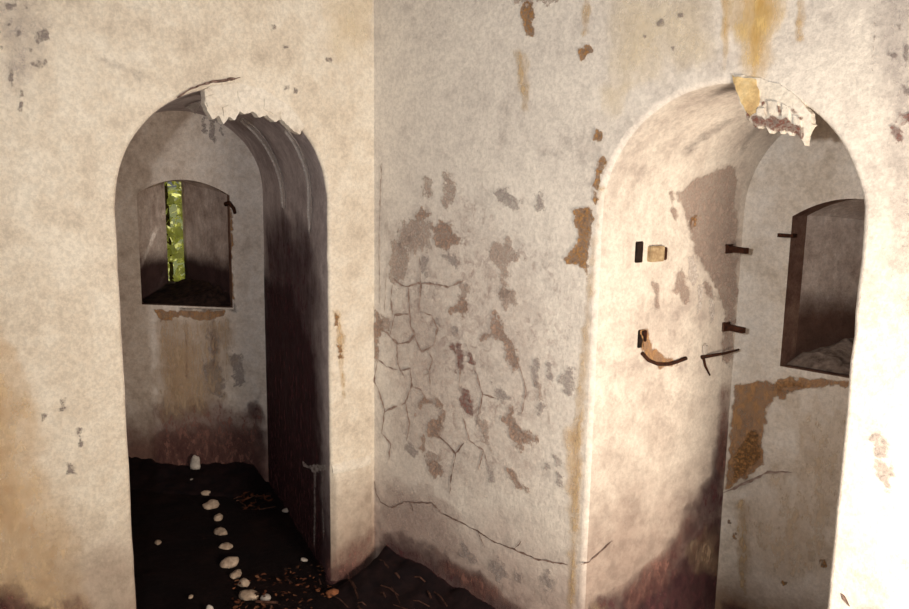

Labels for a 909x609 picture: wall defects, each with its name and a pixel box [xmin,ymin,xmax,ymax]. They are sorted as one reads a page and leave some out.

spalling [514,0,558,37]
rust [737,0,773,66]
flaking render [200,83,305,135]
flaking render [730,74,817,146]
spalling [389,172,462,283]
spalling [564,156,607,273]
spalling [448,283,474,373]
crack [373,166,612,565]
spalling [480,237,520,371]
rust [640,329,673,369]
spalling [491,382,539,453]
spalling [725,381,803,489]